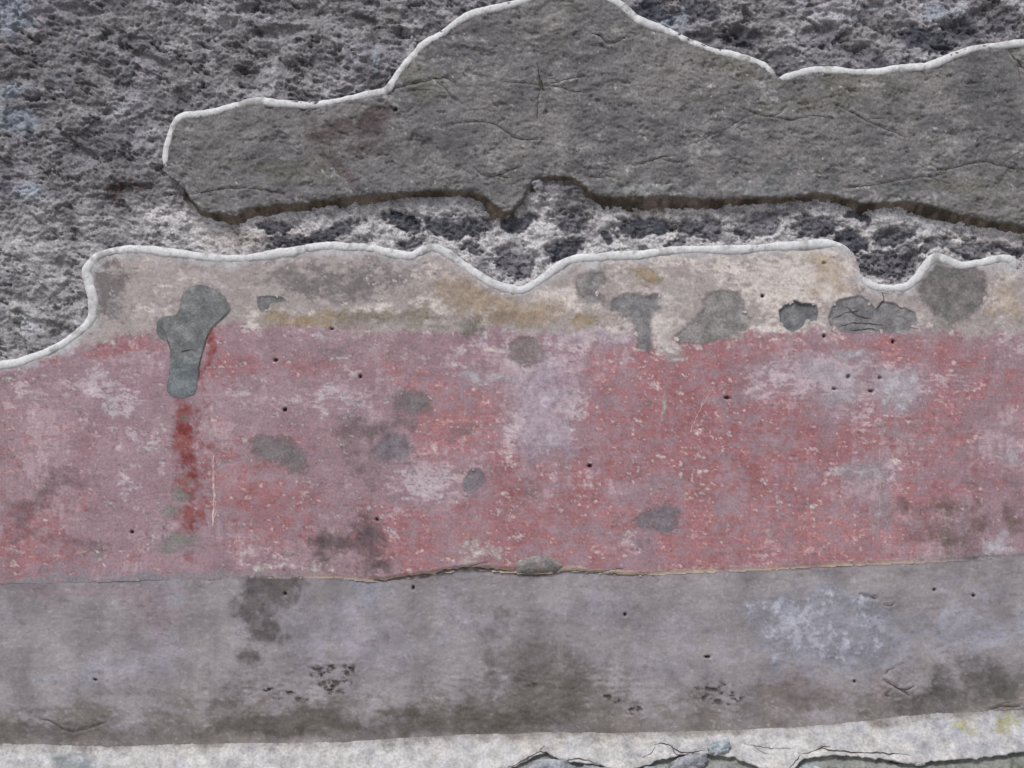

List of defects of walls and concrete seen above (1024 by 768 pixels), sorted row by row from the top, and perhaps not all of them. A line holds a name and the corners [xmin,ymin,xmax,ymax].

crack [450,65,590,140]
crack [588,103,904,178]
crack [852,153,1024,188]
peeling [257,295,286,312]
peeling [576,272,751,361]
peeling [779,293,918,343]
peeling [919,265,987,320]
crack [372,562,512,582]
damp [239,577,301,639]
crack [508,749,600,767]
crack [642,743,705,758]
crack [744,743,964,768]